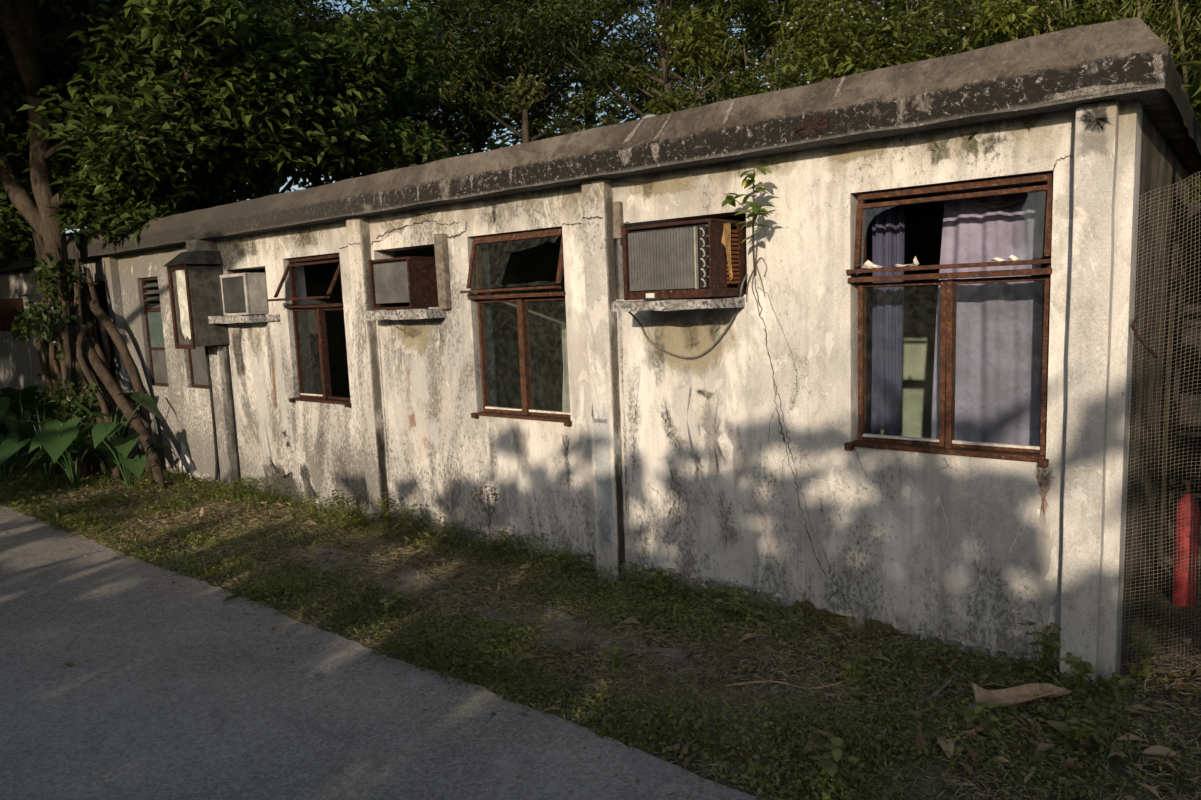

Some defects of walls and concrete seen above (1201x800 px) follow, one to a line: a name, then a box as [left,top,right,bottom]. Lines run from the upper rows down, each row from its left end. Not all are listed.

damp [827,146,876,162]
damp [633,175,697,197]
damp [694,390,746,480]
crack [754,276,866,622]
rust [1036,468,1052,512]